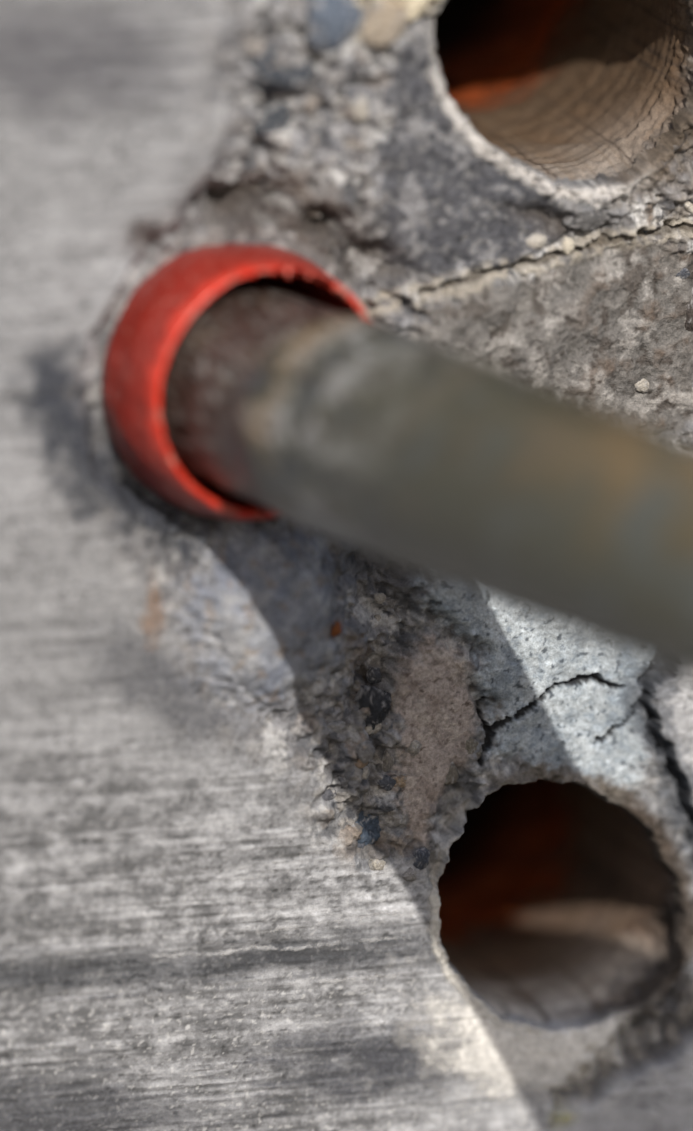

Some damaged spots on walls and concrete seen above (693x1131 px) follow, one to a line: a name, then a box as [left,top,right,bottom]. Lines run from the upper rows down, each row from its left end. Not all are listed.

crack [417,222,693,297]
spalling [63,0,693,890]
crack [476,664,693,844]
spalling [545,914,693,1113]